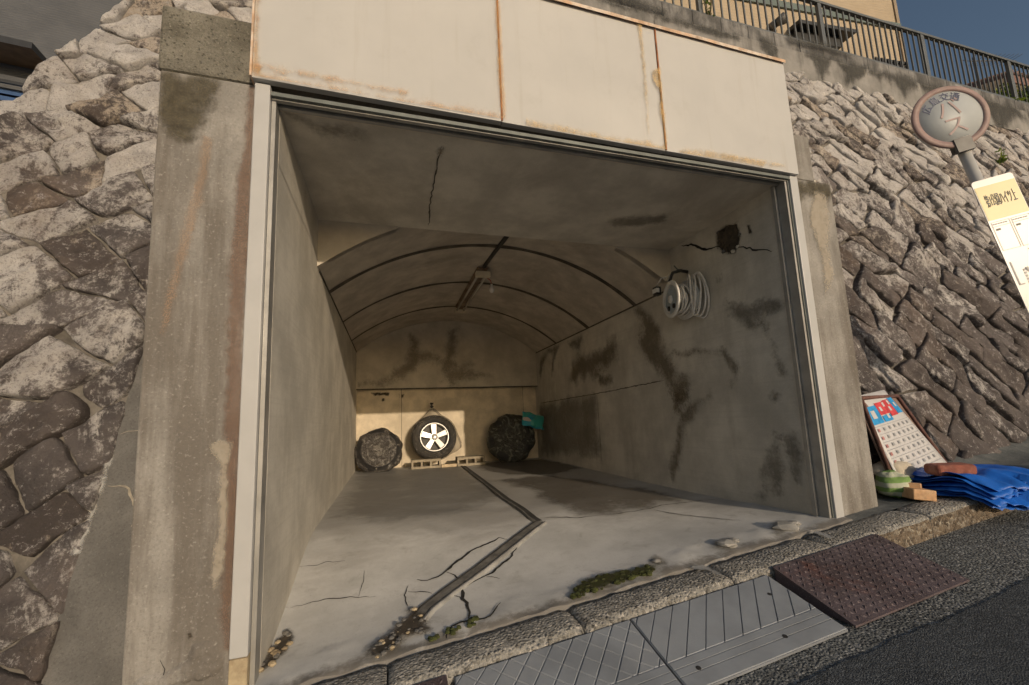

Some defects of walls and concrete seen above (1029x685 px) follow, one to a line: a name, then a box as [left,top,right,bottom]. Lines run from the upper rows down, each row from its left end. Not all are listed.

water stain [159,73,218,141]
crack [428,148,444,224]
crack [682,243,772,252]
spalling [716,221,752,254]
water stain [637,309,693,475]
water stain [481,460,674,512]
crack [299,580,375,606]
crack [404,537,517,638]